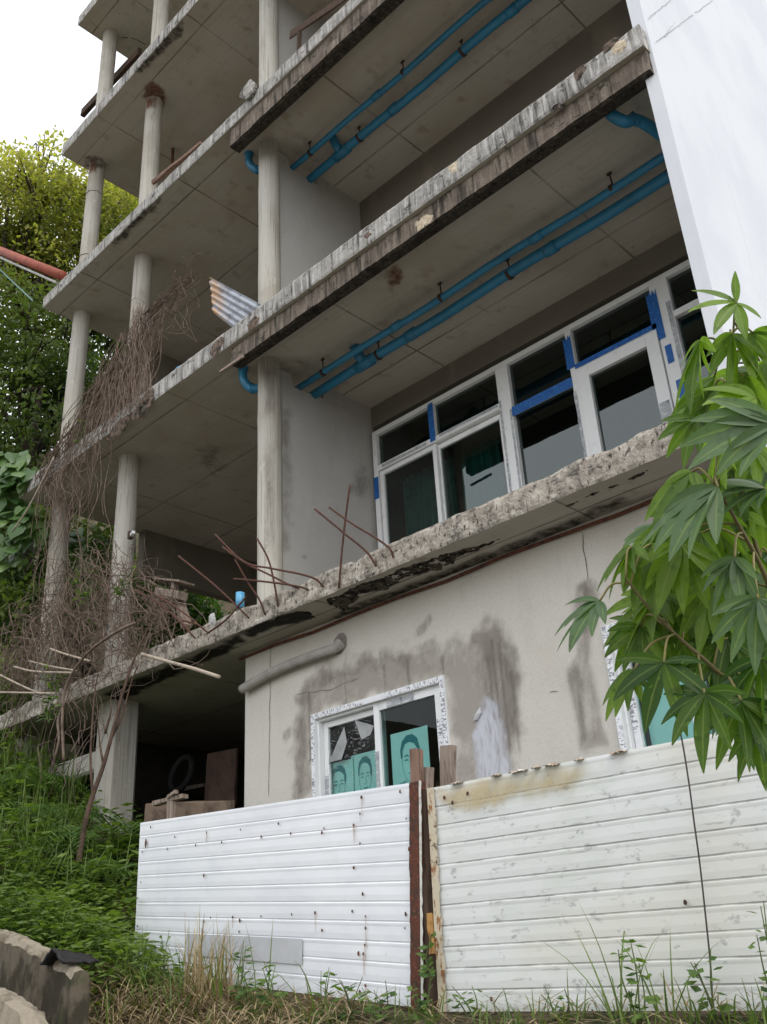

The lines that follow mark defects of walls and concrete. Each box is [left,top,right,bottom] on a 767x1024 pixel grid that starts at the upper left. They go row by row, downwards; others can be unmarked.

rust [144,82,165,108]
spalling [415,214,433,232]
spalling [565,470,648,507]
spalling [326,539,500,611]
water stain [298,631,517,767]
rust [399,781,454,1012]